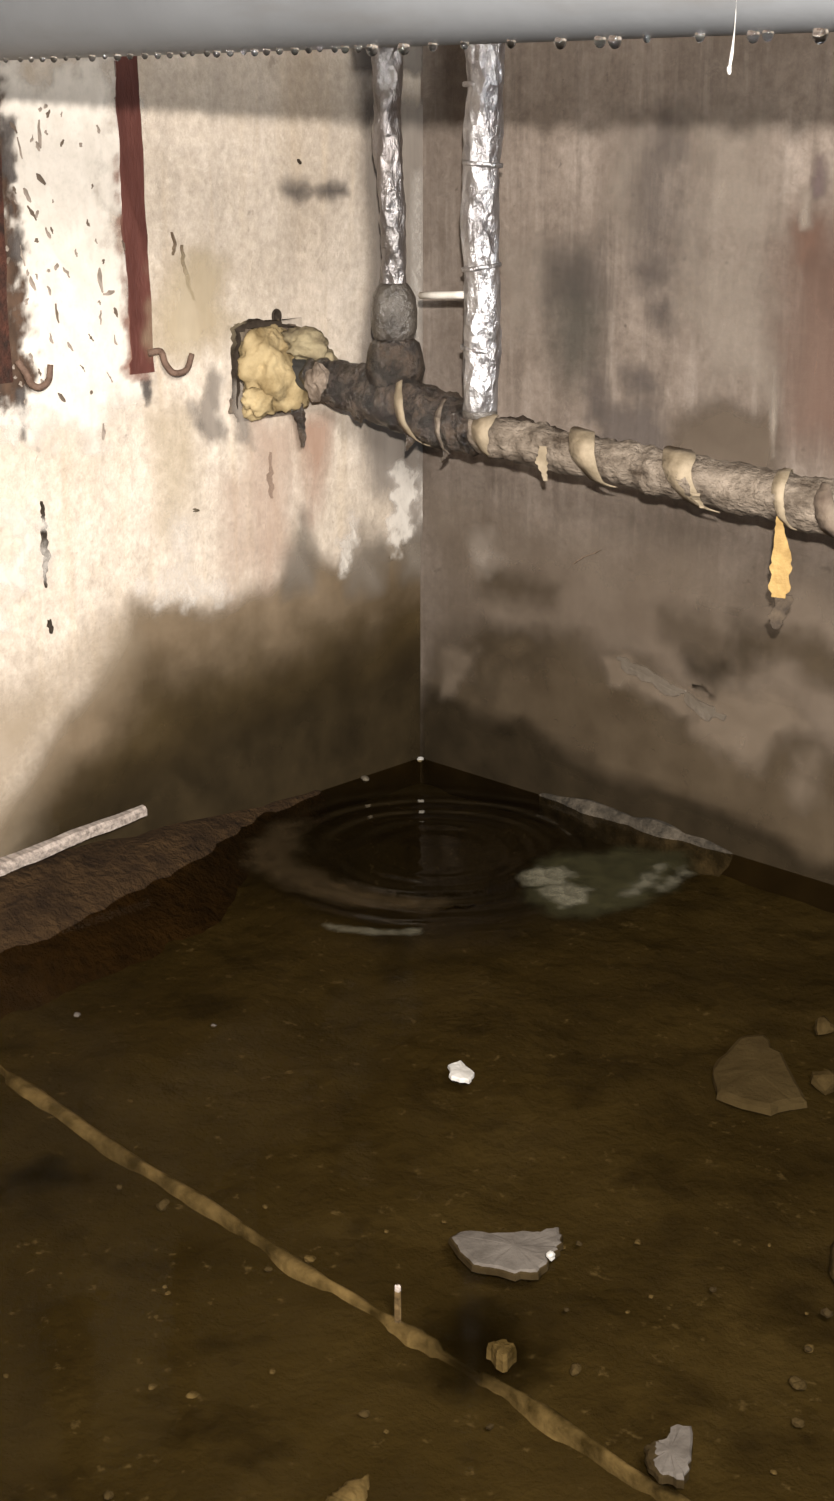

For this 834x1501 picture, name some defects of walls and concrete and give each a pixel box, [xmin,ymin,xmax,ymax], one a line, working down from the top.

damp [364,102,382,363]
damp [401,99,423,353]
damp [590,382,779,470]
damp [0,421,834,885]